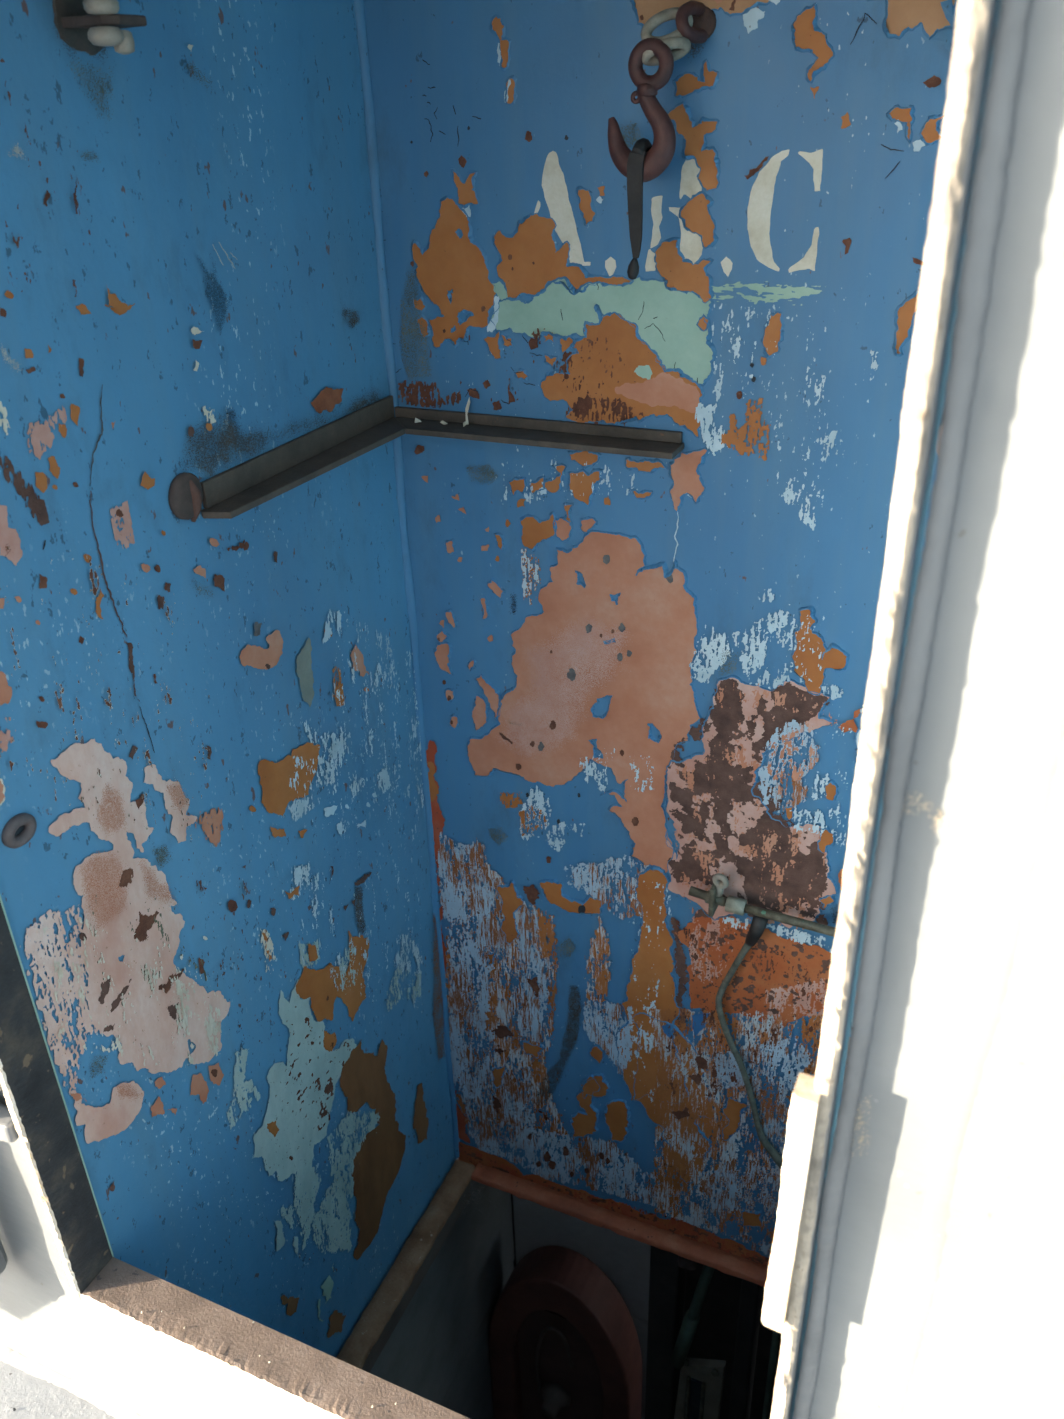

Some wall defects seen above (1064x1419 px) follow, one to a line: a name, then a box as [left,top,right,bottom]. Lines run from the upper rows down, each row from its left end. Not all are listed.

peeling [630,0,780,34]
peeling [791,3,835,99]
peeling [867,0,957,54]
peeling [886,104,945,151]
peeling [863,286,920,381]
peeling [0,59,864,1338]
corrosion [667,678,830,925]
corrosion [666,909,827,1120]